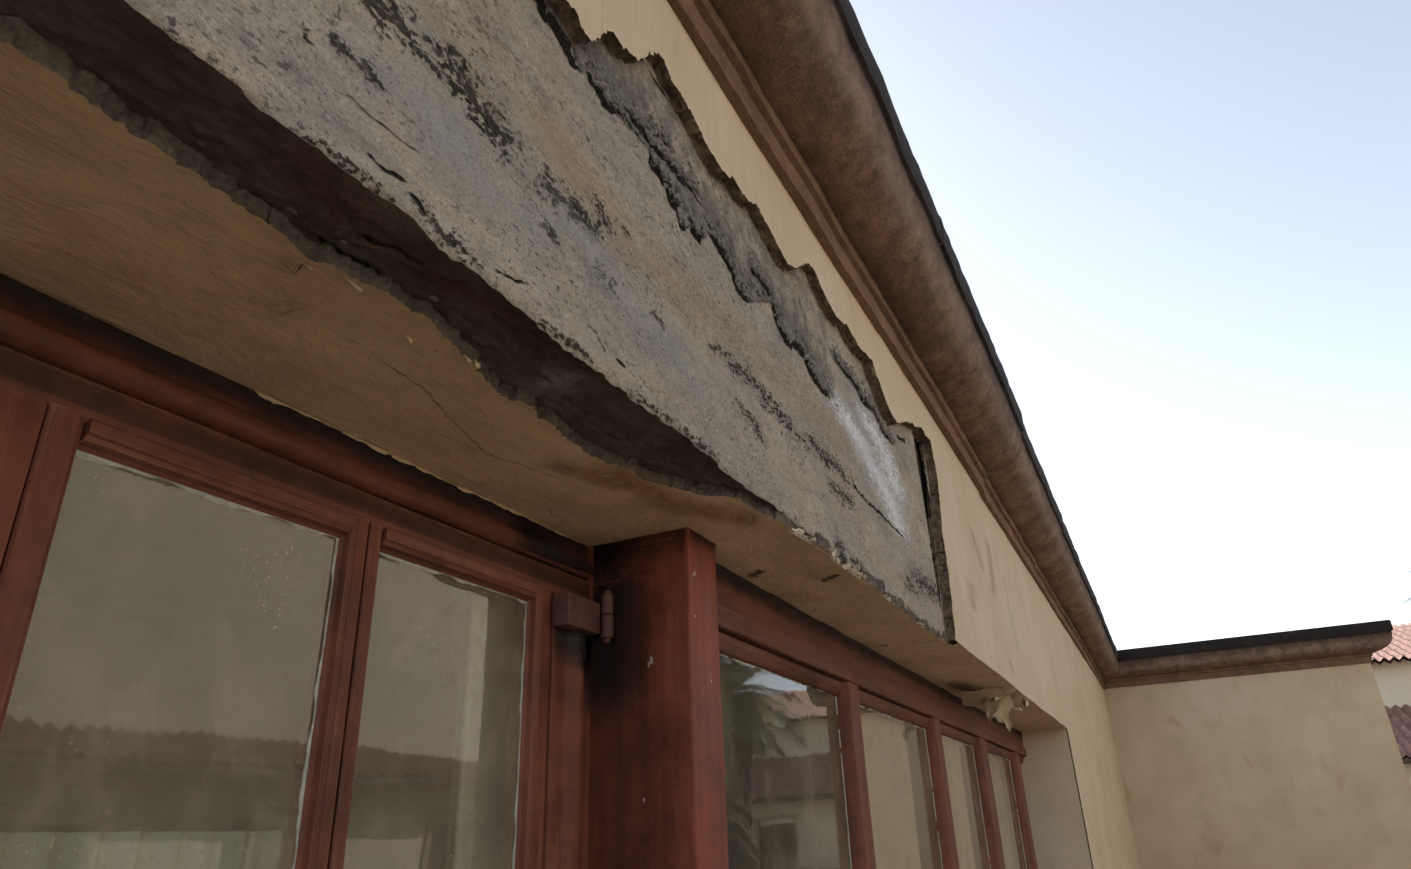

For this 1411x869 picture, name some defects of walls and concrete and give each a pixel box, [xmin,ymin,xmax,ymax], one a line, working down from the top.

spalling [0,0,955,645]
crack [496,269,524,283]
crack [535,0,931,507]
crack [377,357,557,515]
crack [850,472,903,537]